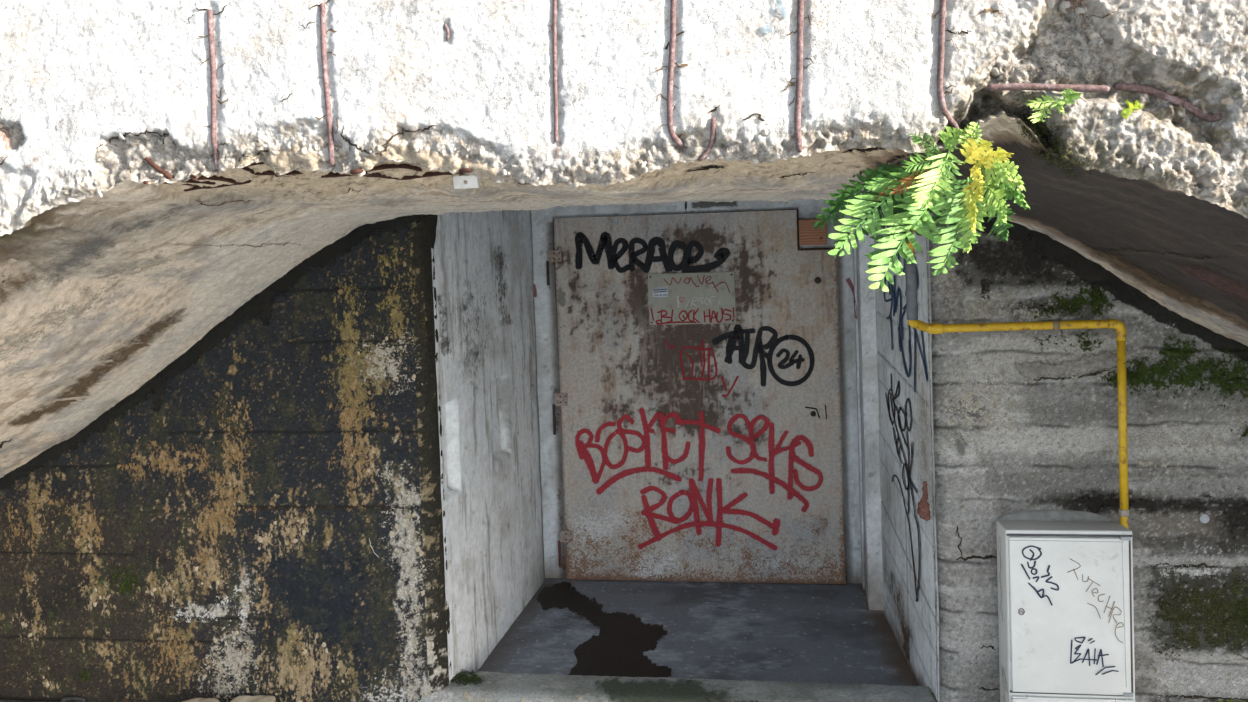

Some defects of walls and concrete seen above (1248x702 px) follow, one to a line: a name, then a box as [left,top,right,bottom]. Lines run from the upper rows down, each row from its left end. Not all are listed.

spalling [94,3,531,198]
spalling [641,0,778,174]
spalling [794,0,804,153]
spalling [937,0,959,129]
spalling [987,0,1223,122]
water stain [0,214,424,490]
water stain [438,246,511,391]
water stain [956,214,1248,364]
water stain [169,464,500,702]
water stain [537,582,752,702]
crack [956,526,997,561]
water stain [1071,490,1248,579]